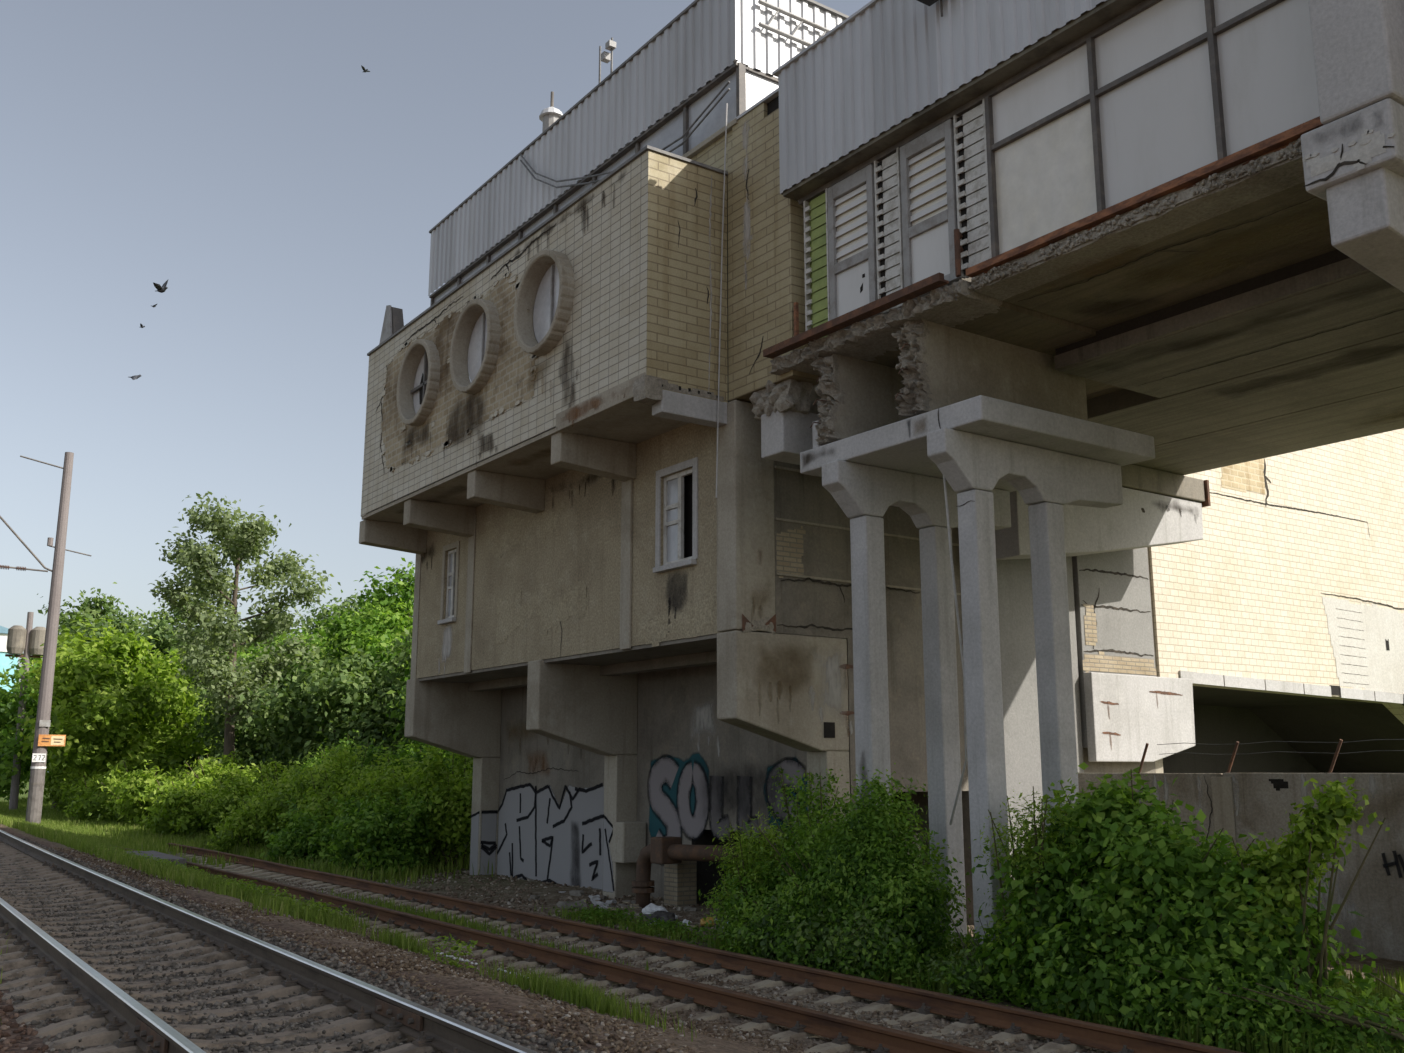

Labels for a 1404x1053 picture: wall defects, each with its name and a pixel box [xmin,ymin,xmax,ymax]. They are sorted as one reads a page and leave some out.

spalling [969,129,1395,289]
crack [1018,144,1394,302]
water stain [405,397,493,465]
crack [1210,459,1370,536]
water stain [668,578,686,623]
crack [777,577,853,631]
crack [886,586,920,594]
crack [1079,569,1154,657]